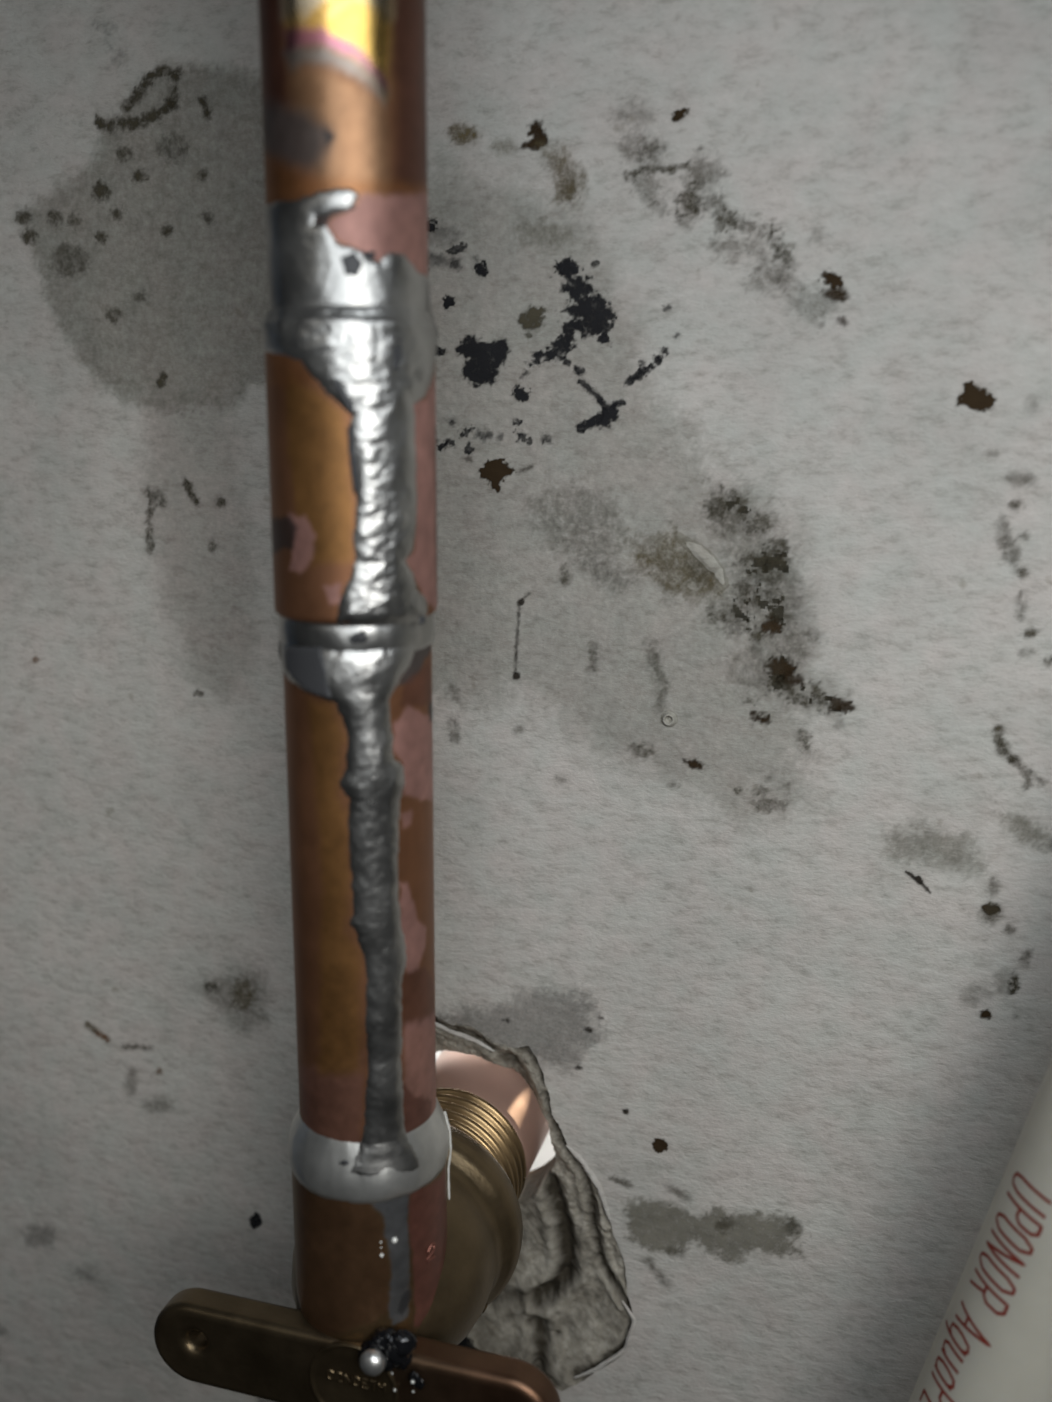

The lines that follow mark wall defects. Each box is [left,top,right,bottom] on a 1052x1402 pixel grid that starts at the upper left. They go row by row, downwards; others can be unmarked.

water stain [95,66,180,131]
water stain [450,125,477,143]
water stain [522,121,583,200]
water stain [672,108,689,121]
water stain [632,163,737,229]
water stain [822,271,847,301]
water stain [183,479,199,504]
water stain [752,613,782,641]
water stain [766,657,854,714]
water stain [750,711,770,724]
flaking render [435,1015,636,1392]
water stain [625,1191,801,1269]